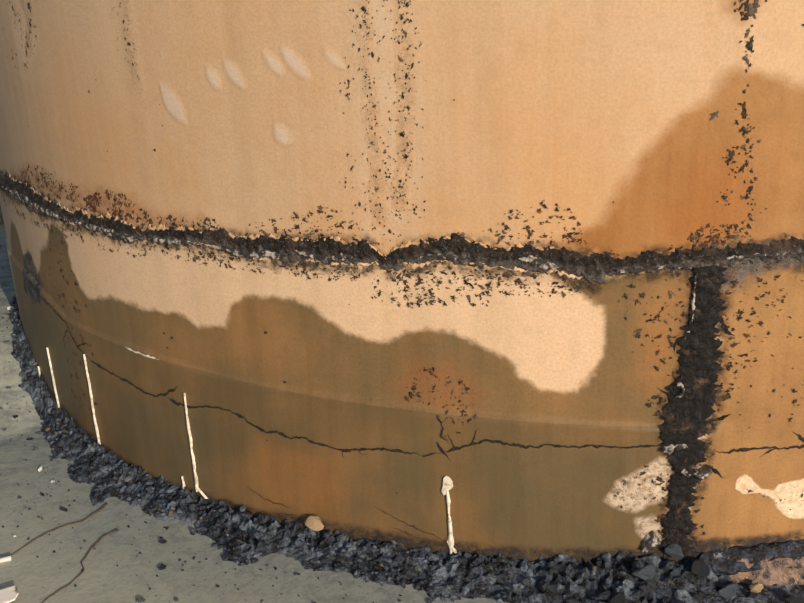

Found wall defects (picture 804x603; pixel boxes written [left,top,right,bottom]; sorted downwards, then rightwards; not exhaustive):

water stain [705,0,781,38]
water stain [536,51,804,259]
rust [653,136,765,250]
water stain [9,216,697,559]
crack [0,171,804,562]
water stain [686,259,804,551]
peeling [734,473,804,521]